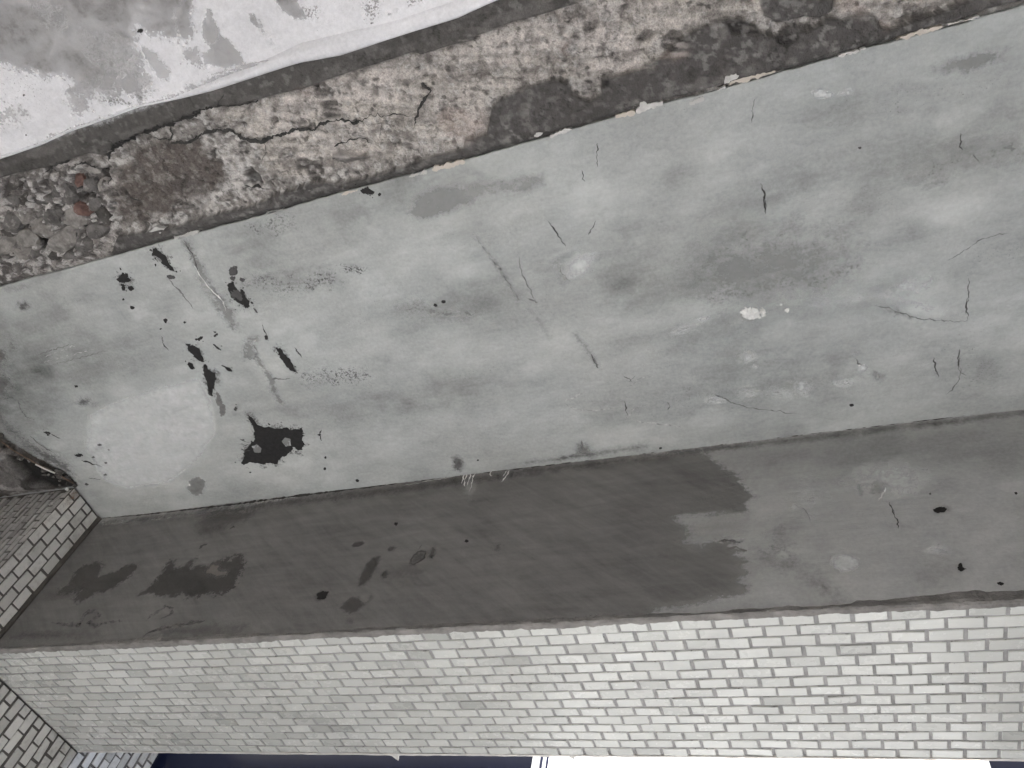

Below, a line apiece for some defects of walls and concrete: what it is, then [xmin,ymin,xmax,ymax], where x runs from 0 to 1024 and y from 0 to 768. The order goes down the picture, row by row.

crack [45,82,432,201]
spalling [0,0,1024,313]
spalling [0,433,109,497]
flaking render [185,331,322,473]
flaking render [262,325,371,385]
crack [108,349,993,524]
crack [876,278,970,322]
water stain [0,441,752,648]